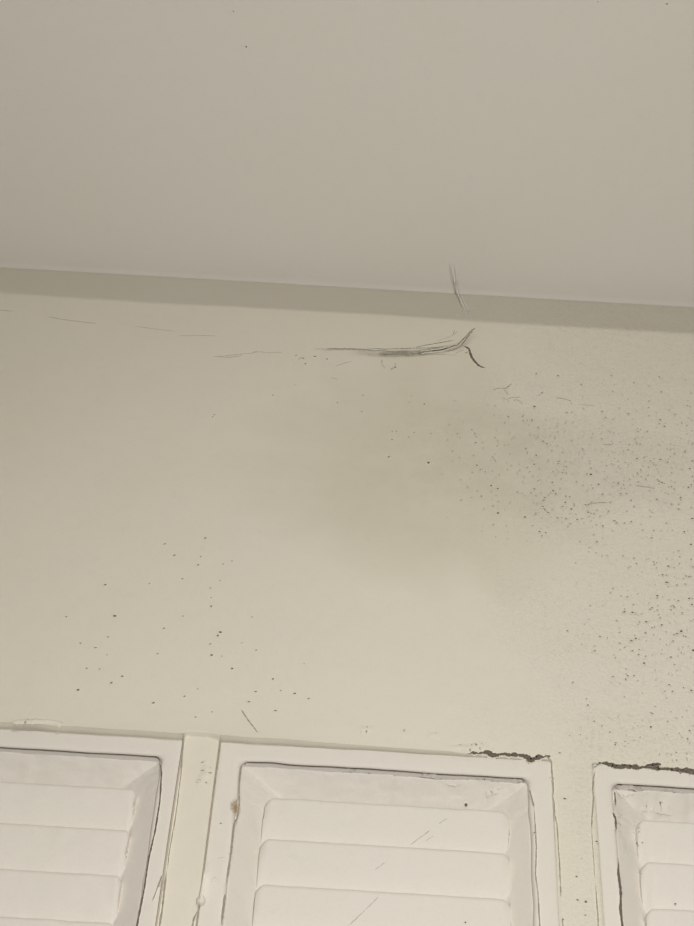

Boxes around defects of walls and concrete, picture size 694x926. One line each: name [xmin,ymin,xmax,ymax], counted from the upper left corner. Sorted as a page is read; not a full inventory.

crack [320,328,486,369]
crack [492,383,595,406]